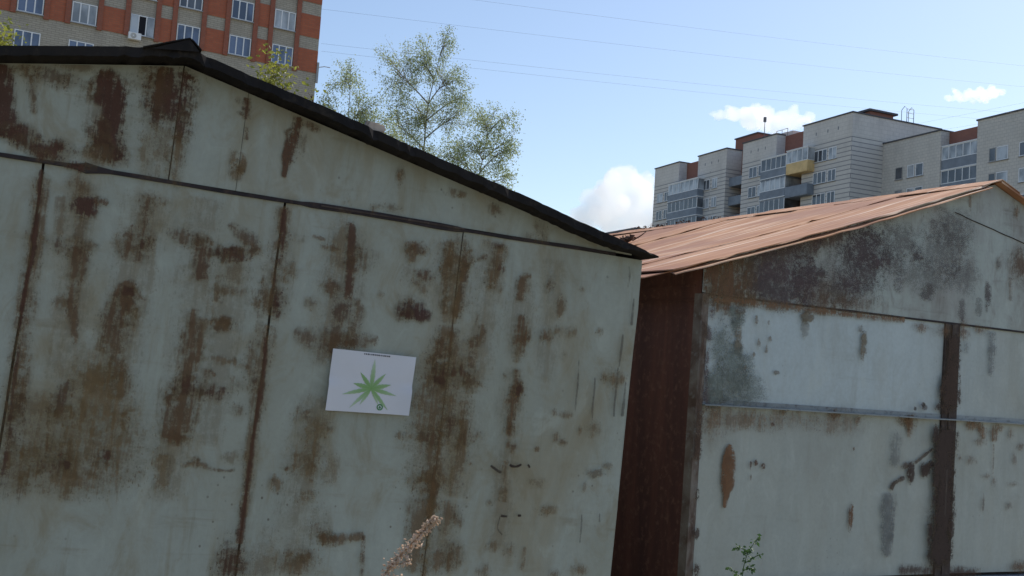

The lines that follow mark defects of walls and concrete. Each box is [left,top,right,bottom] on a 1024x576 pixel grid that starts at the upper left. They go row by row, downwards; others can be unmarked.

corrosion [142,66,196,143]
corrosion [282,117,318,178]
corrosion [0,64,145,497]
corrosion [121,195,155,262]
corrosion [294,222,378,353]
corrosion [516,274,531,301]
corrosion [161,206,291,576]
corrosion [396,240,507,576]
corrosion [503,315,551,502]
corrosion [898,325,983,434]
corrosion [721,444,736,508]
corrosion [890,422,1011,576]